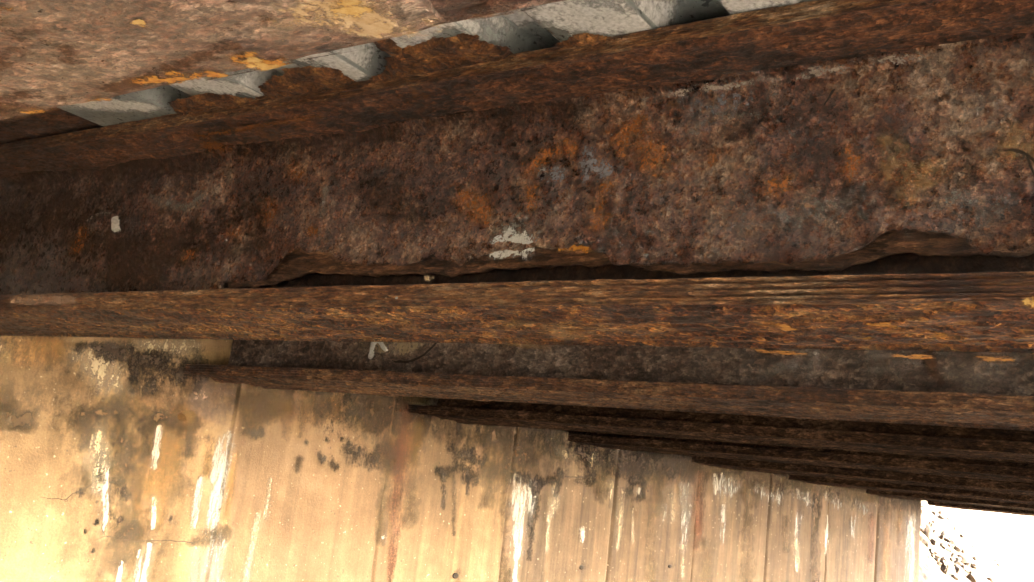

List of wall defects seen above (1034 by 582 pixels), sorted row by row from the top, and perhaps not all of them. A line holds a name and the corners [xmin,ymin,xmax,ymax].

corrosion [0,0,677,117]
corrosion [0,115,323,292]
corrosion [521,137,579,214]
corrosion [604,114,672,178]
corrosion [558,244,589,254]
corrosion [11,295,74,305]
corrosion [751,348,806,356]
corrosion [770,321,799,331]
water stain [0,390,36,431]
water stain [55,339,218,582]
corrosion [139,431,182,531]
water stain [190,389,923,582]